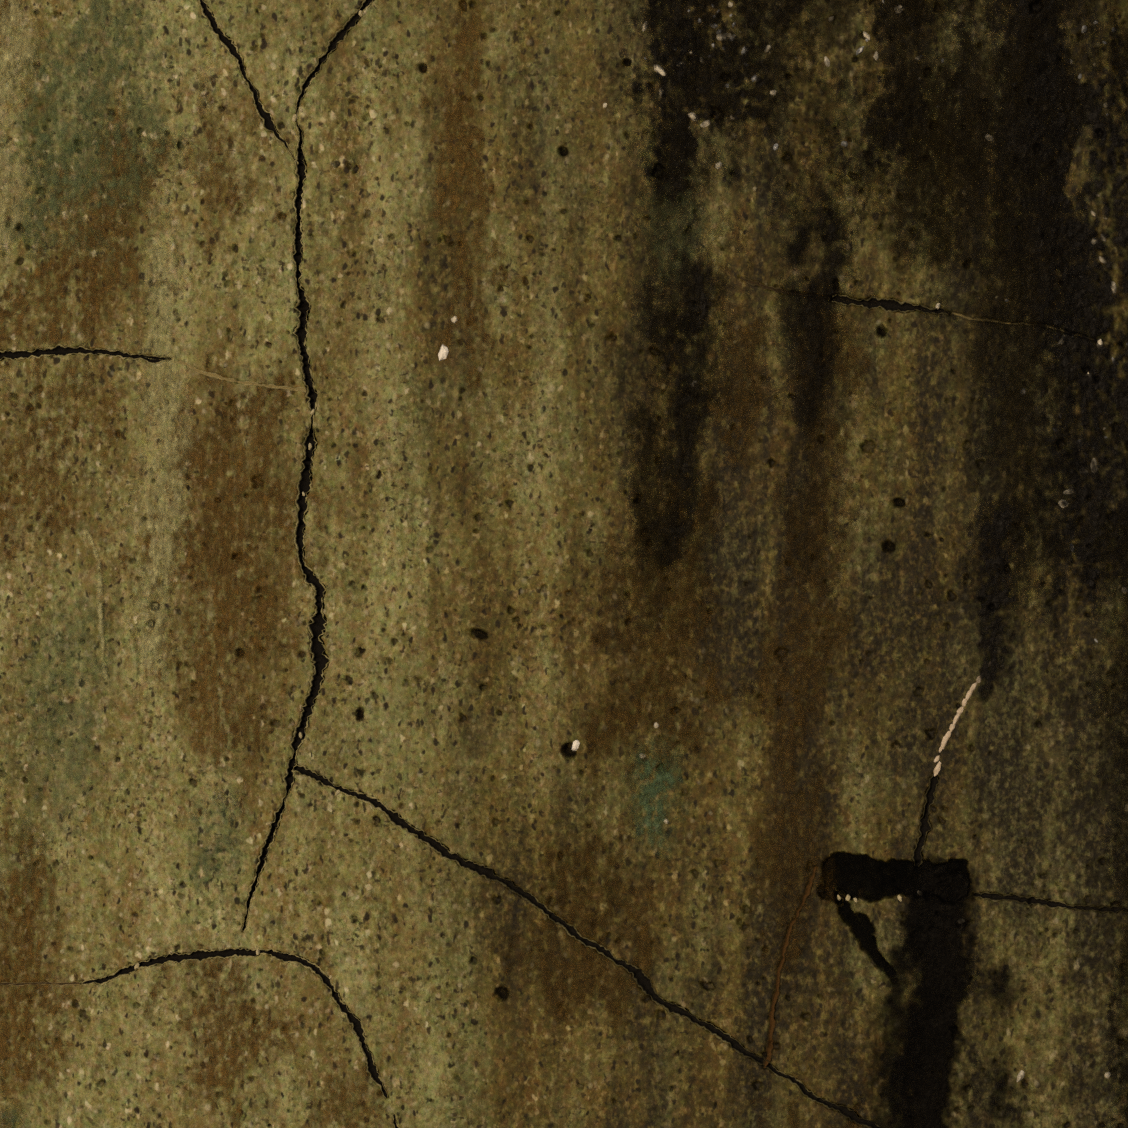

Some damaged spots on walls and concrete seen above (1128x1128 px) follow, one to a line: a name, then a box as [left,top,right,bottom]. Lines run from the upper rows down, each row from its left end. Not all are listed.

water stain [629,0,1128,700]
crack [739,276,1063,331]
crack [0,0,880,1128]
crack [911,676,981,867]
water stain [870,855,974,1128]
water stain [983,967,1021,1007]
crack [974,892,1128,914]
water stain [981,1061,1024,1125]